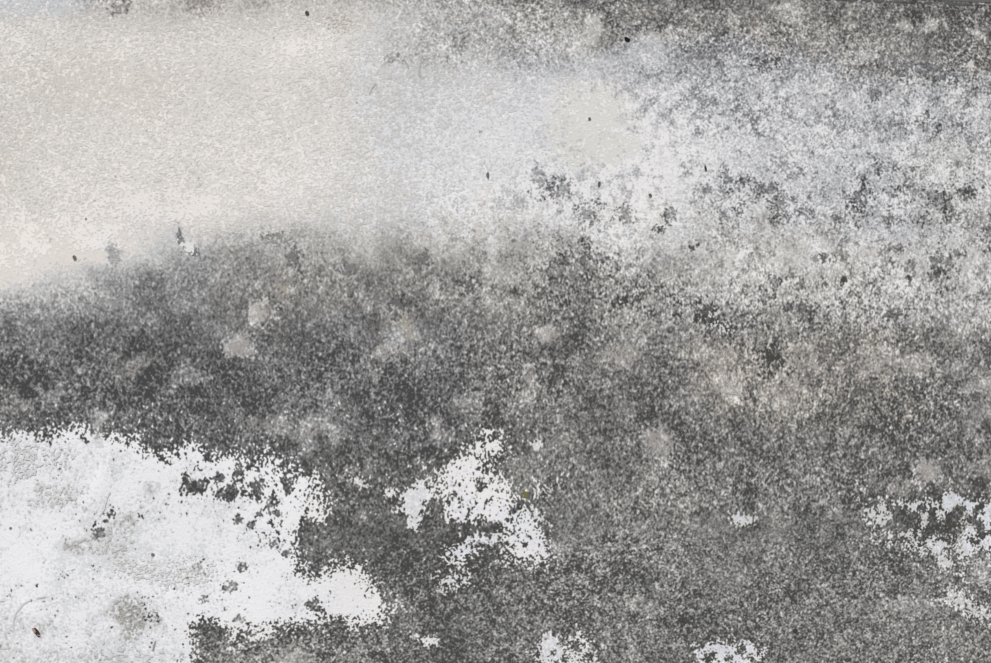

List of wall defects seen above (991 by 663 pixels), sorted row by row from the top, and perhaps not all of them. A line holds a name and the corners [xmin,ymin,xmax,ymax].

damp [27,479,77,508]
damp [63,514,218,595]
mould [939,517,964,542]
damp [0,595,184,663]